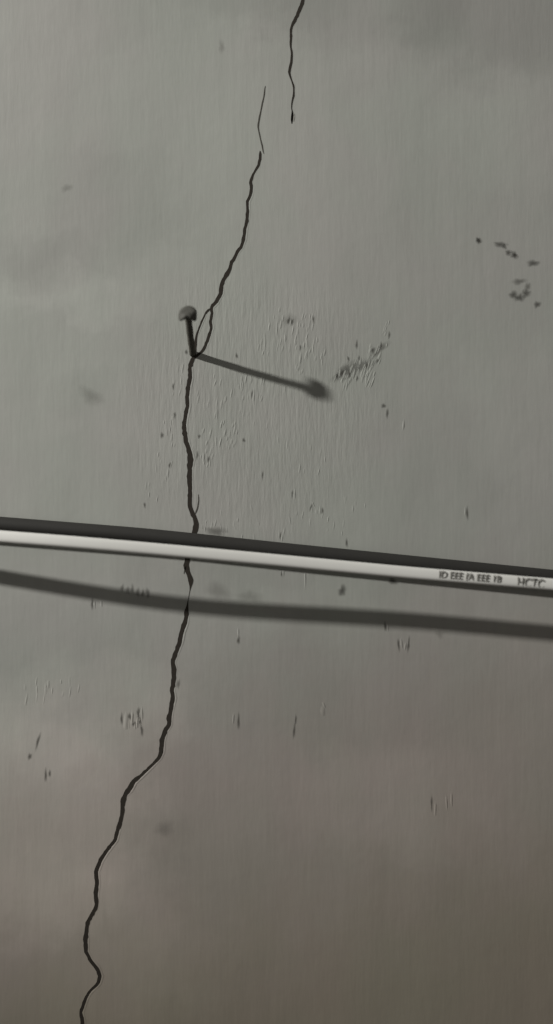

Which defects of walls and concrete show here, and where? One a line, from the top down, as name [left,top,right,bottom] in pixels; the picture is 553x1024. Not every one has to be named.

crack [288,0,305,124]
crack [182,88,265,533]
crack [79,558,193,1024]